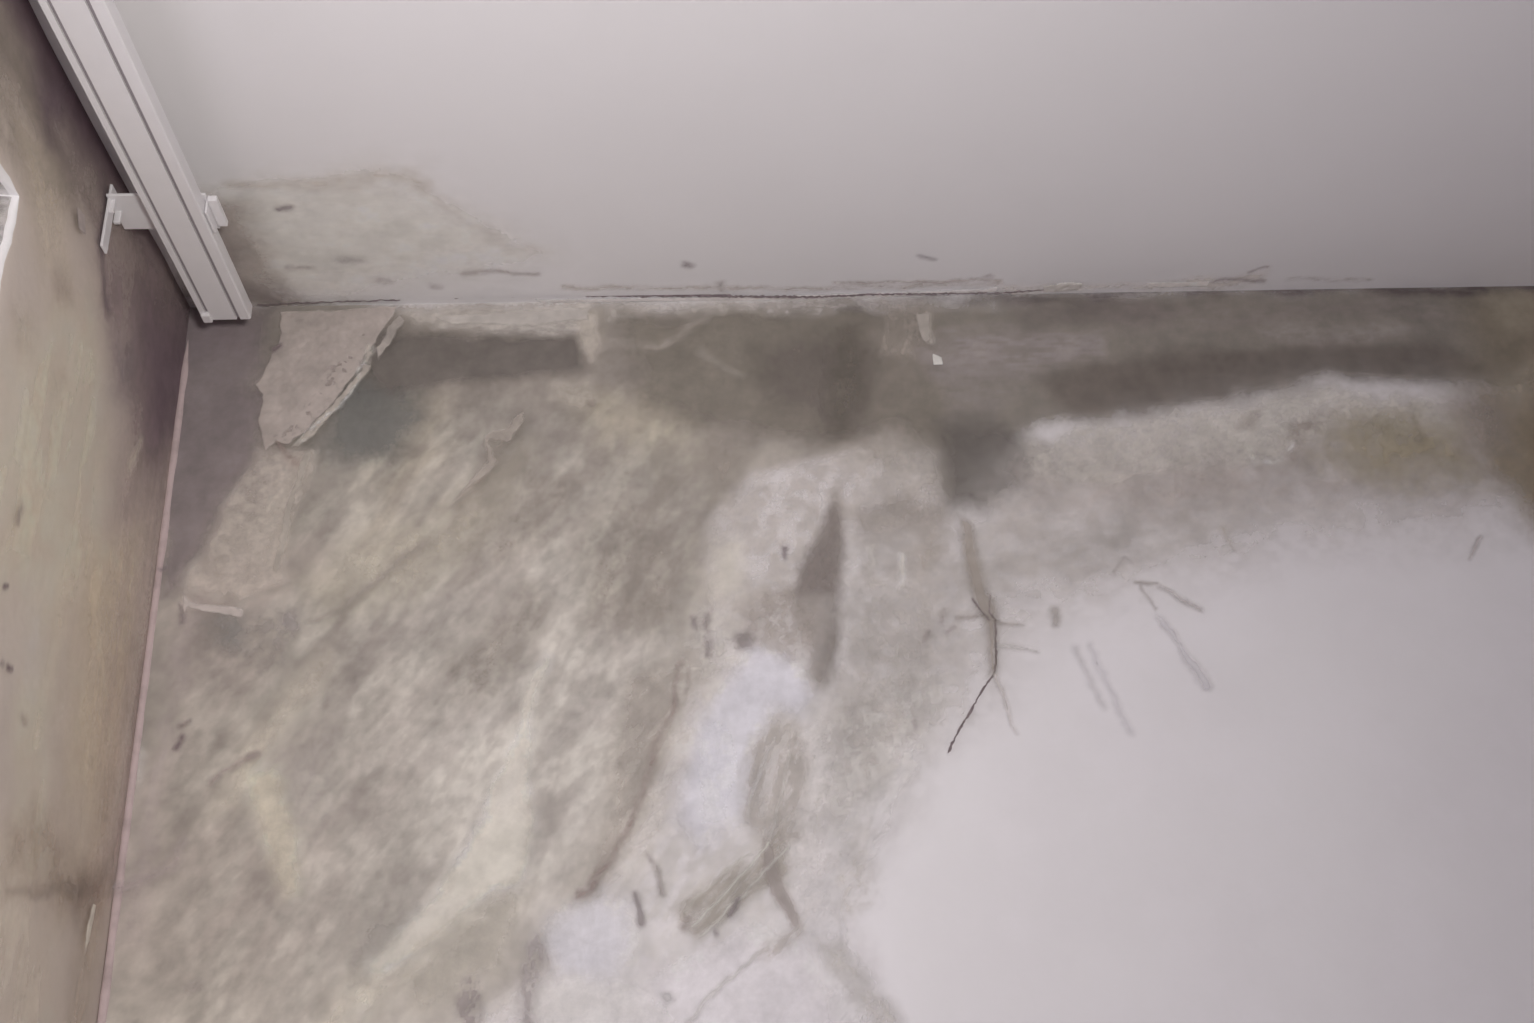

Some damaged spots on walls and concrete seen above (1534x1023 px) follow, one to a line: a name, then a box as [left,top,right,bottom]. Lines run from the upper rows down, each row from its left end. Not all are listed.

damp [0,196,9,243]
damp [0,0,129,219]
peeling [181,304,595,650]
damp [104,185,1534,1023]
crack [948,521,999,753]